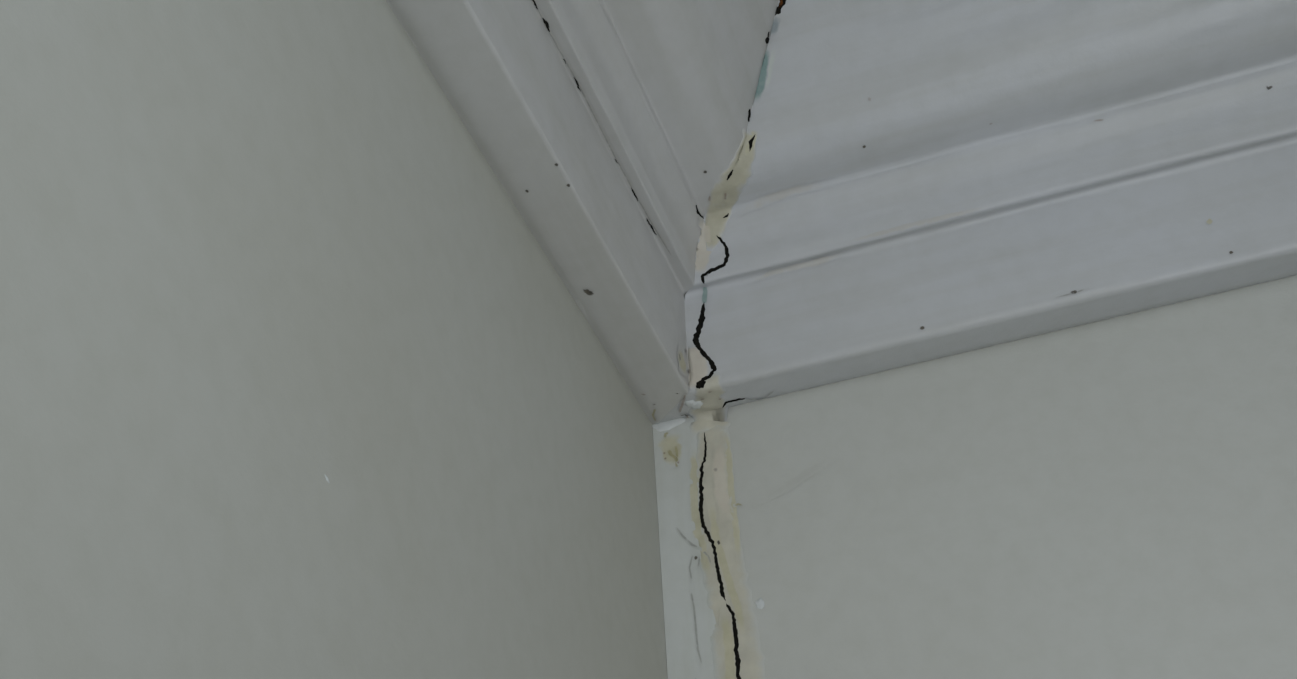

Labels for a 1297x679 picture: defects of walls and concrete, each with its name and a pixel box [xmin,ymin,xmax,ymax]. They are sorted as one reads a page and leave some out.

crack [531,0,675,259]
crack [692,109,776,407]
crack [775,0,786,15]
crack [676,432,741,679]